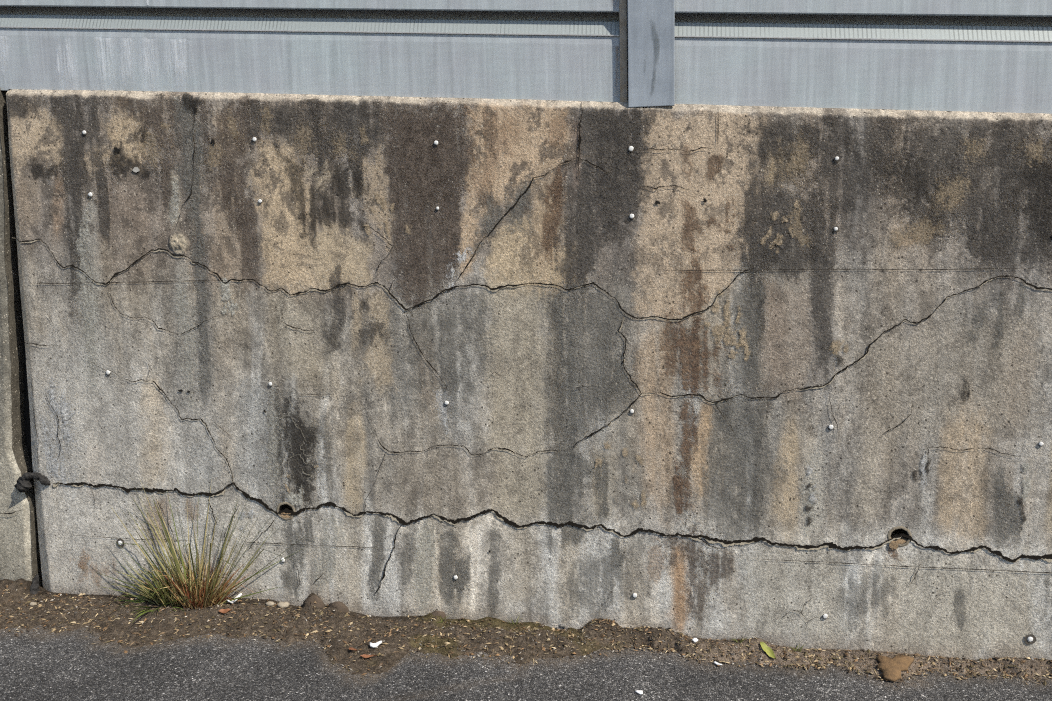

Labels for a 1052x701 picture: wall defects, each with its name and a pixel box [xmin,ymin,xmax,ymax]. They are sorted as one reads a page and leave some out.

damp [7,93,112,388]
damp [267,386,333,503]
damp [280,507,344,595]
damp [112,94,532,427]
crack [12,102,1052,599]
damp [539,107,657,552]
damp [570,537,634,615]
damp [666,394,788,620]
damp [733,113,1052,387]